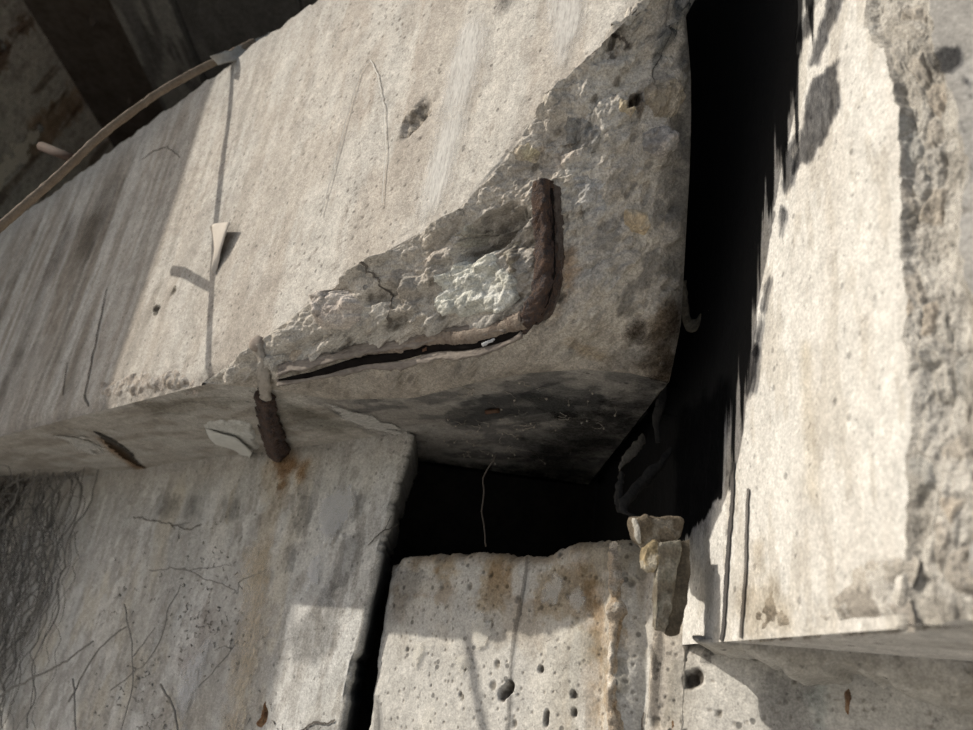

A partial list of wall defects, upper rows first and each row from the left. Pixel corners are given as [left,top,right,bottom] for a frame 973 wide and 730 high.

spalling [100,0,691,435]
crack [62,288,107,407]
corrosion [249,178,565,463]
crack [94,432,145,468]
spalling [632,518,641,545]